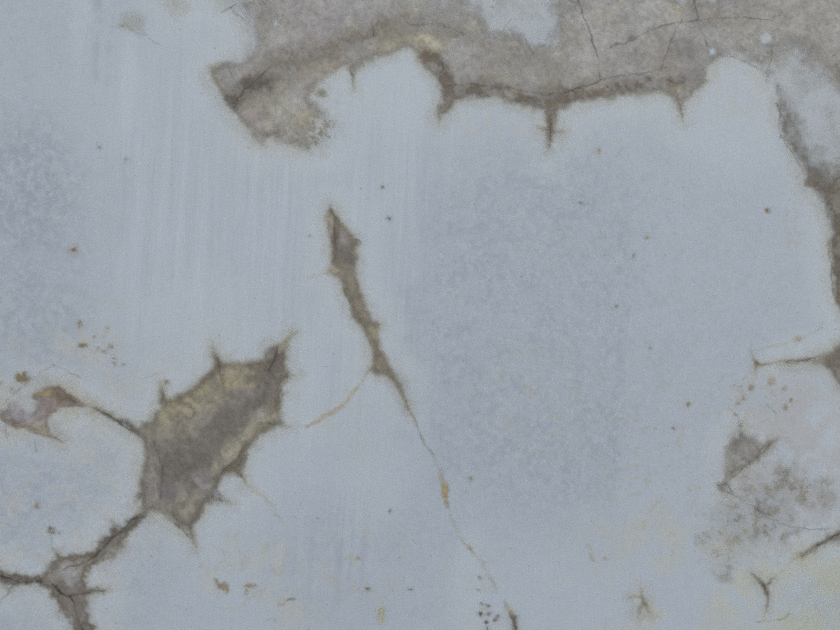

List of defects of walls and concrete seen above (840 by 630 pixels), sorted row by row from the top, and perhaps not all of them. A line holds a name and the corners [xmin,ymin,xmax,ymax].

peeling [209,0,742,151]
crack [325,207,410,410]
peeling [0,337,290,544]
crack [441,483,449,506]